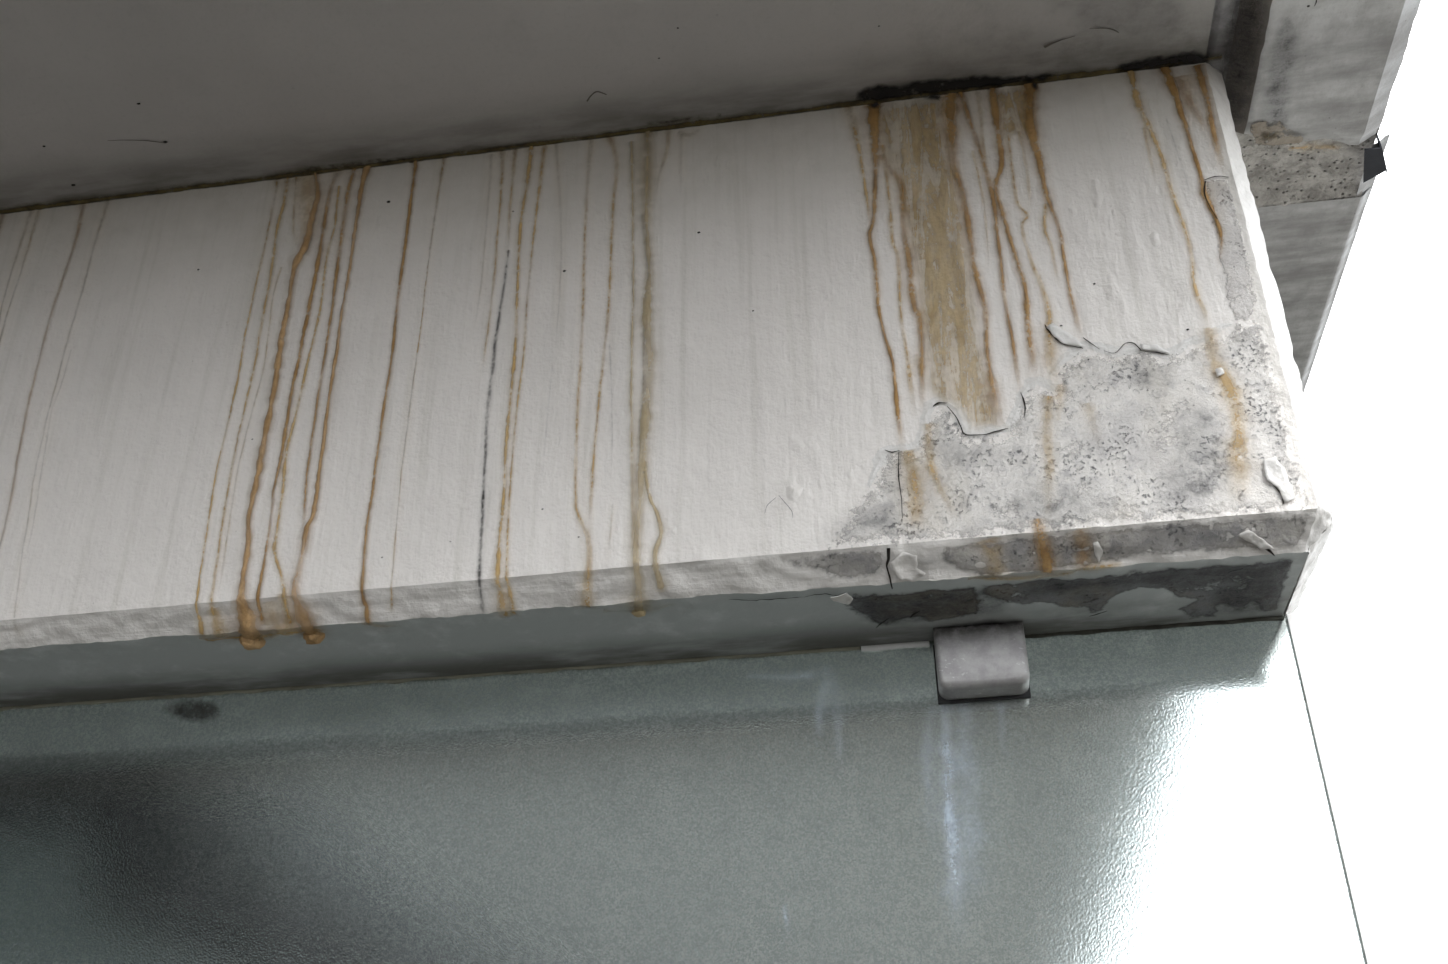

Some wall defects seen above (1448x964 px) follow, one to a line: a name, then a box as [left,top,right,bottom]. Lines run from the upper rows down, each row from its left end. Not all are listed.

rust [195,166,371,641]
rust [495,338,525,616]
rust [515,146,545,316]
leakage [0,1,1259,612]
rust [853,83,1076,423]
crack [933,394,1026,436]
rust [1036,518,1053,574]
peeling [794,179,1309,624]
crack [1044,324,1171,356]
rust [1128,70,1189,241]
rust [1160,64,1223,246]
rust [1217,366,1243,461]